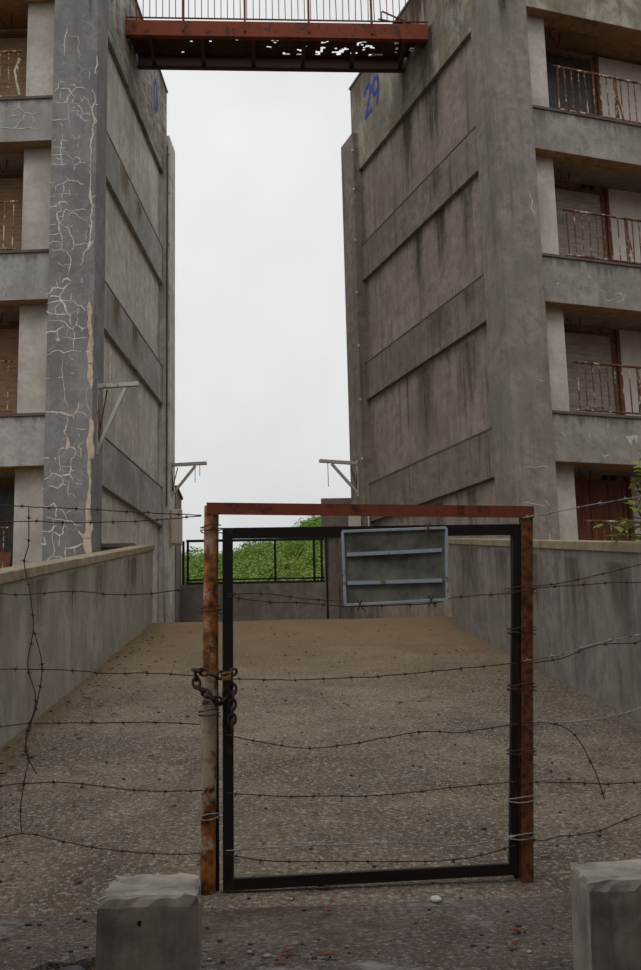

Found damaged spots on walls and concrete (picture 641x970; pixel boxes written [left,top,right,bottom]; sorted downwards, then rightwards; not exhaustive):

crack [0,29,98,560]